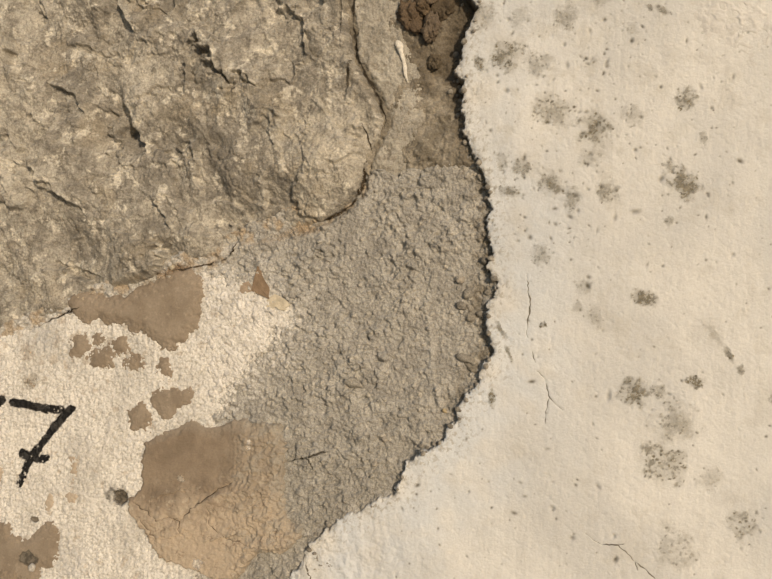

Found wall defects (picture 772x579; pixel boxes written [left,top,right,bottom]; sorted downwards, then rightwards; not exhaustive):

crack [324,0,387,221]
damp [581,112,614,140]
damp [668,162,698,198]
spalling [0,0,498,579]
crack [526,281,560,421]
damp [619,379,665,404]
damp [644,446,686,487]
crack [585,533,655,578]